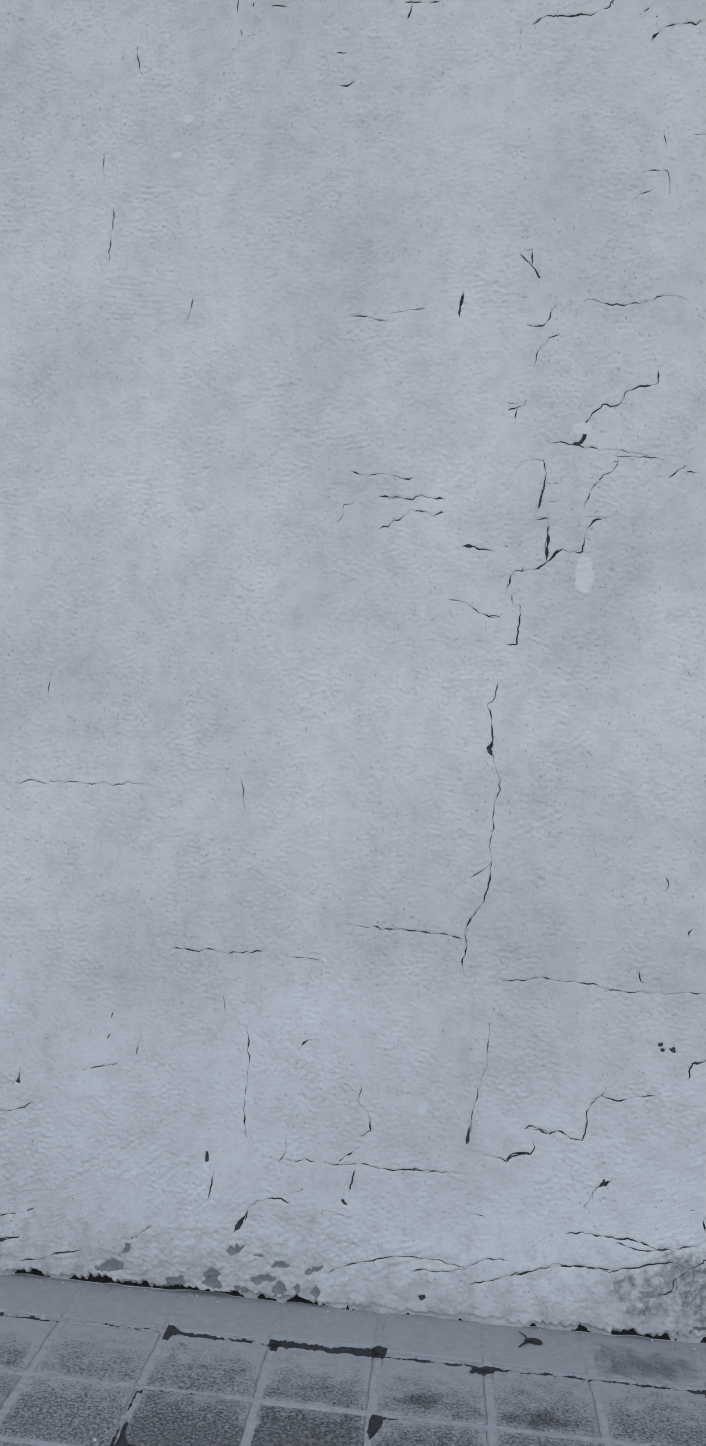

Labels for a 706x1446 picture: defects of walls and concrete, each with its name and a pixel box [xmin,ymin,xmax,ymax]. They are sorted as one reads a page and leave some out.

crack [533,0,701,41]
crack [457,291,465,317]
crack [519,249,685,363]
crack [337,471,443,528]
crack [449,371,696,645]
crack [350,683,700,995]
crack [223,997,250,1137]
crack [234,1023,654,1232]
crack [328,1179,706,1299]